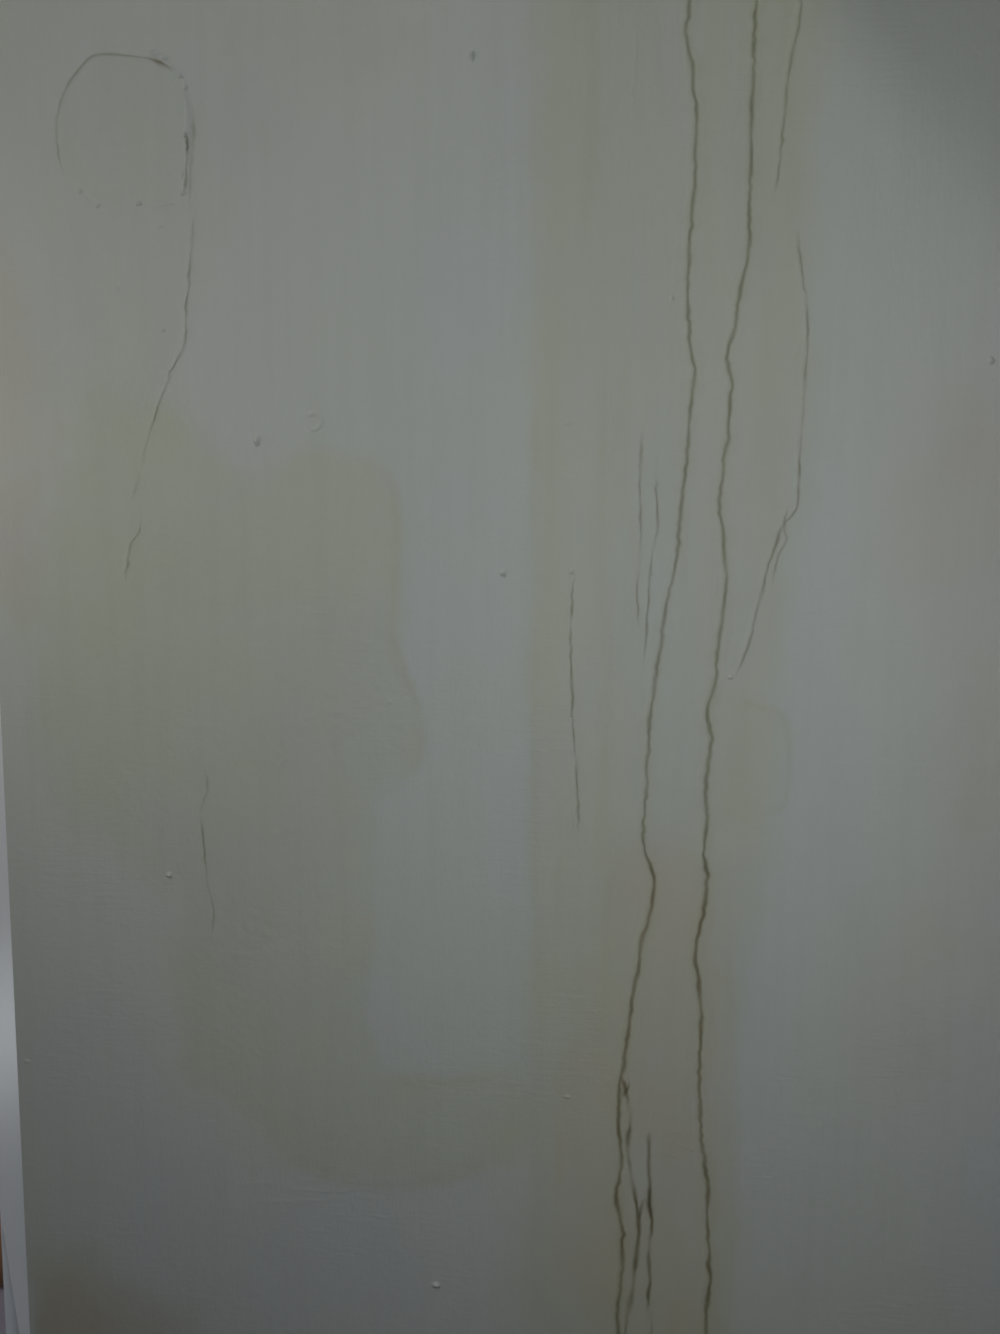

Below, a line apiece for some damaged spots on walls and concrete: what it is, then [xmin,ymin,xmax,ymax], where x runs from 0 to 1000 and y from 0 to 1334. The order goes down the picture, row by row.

crack [121,215,197,580]
crack [606,0,810,1334]